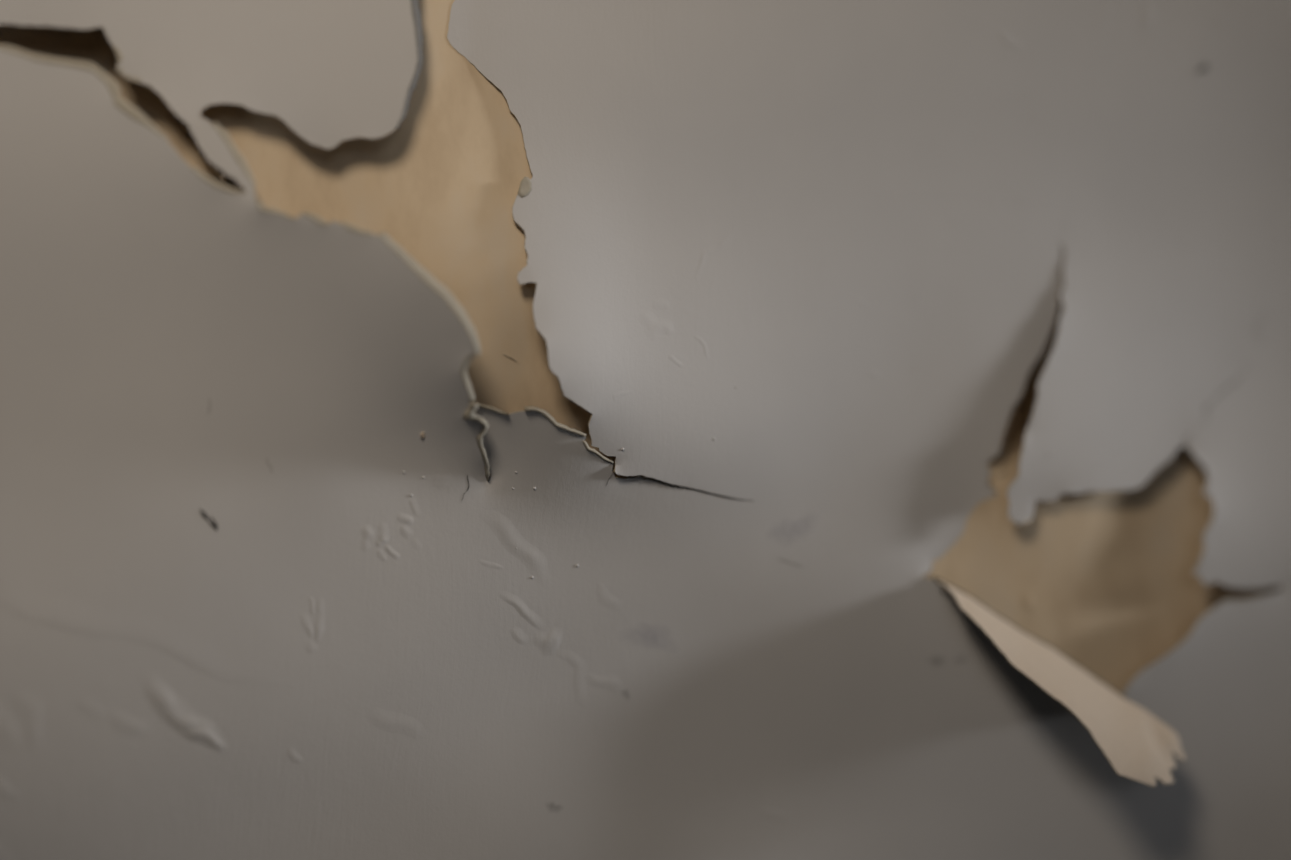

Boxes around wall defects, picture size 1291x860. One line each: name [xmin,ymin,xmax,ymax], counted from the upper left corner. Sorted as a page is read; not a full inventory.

peeling [0,0,750,501]
peeling [921,248,1282,786]